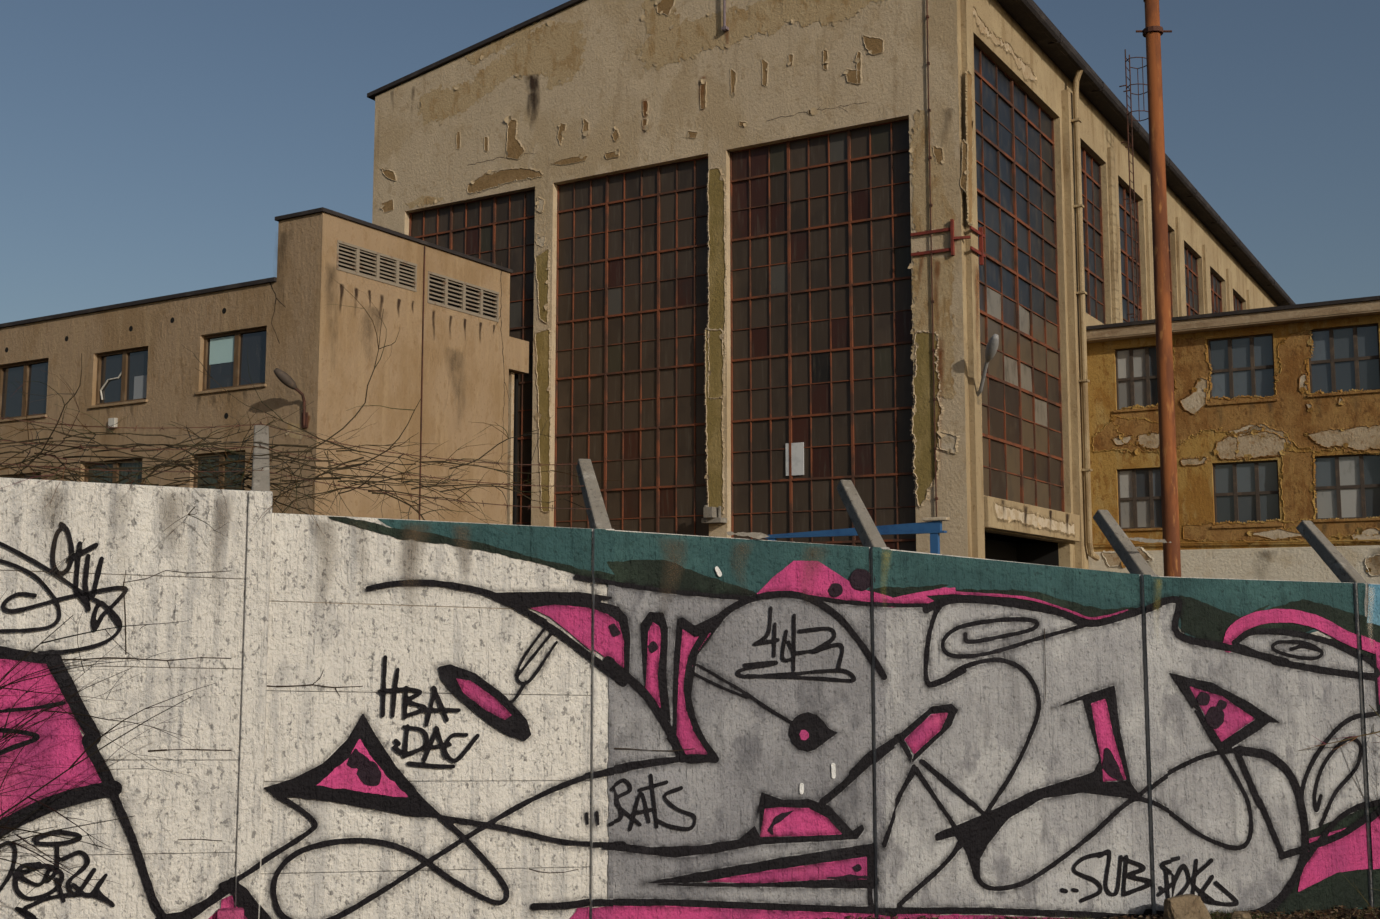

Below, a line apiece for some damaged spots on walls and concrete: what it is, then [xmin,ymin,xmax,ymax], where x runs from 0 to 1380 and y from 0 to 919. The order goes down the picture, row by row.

peeling [417,20,587,150]
peeling [699,79,707,110]
peeling [635,0,884,71]
peeling [761,58,769,88]
peeling [822,34,885,86]
peeling [466,116,620,195]
peeling [535,196,545,214]
peeling [534,233,552,514]
peeling [1091,328,1380,578]